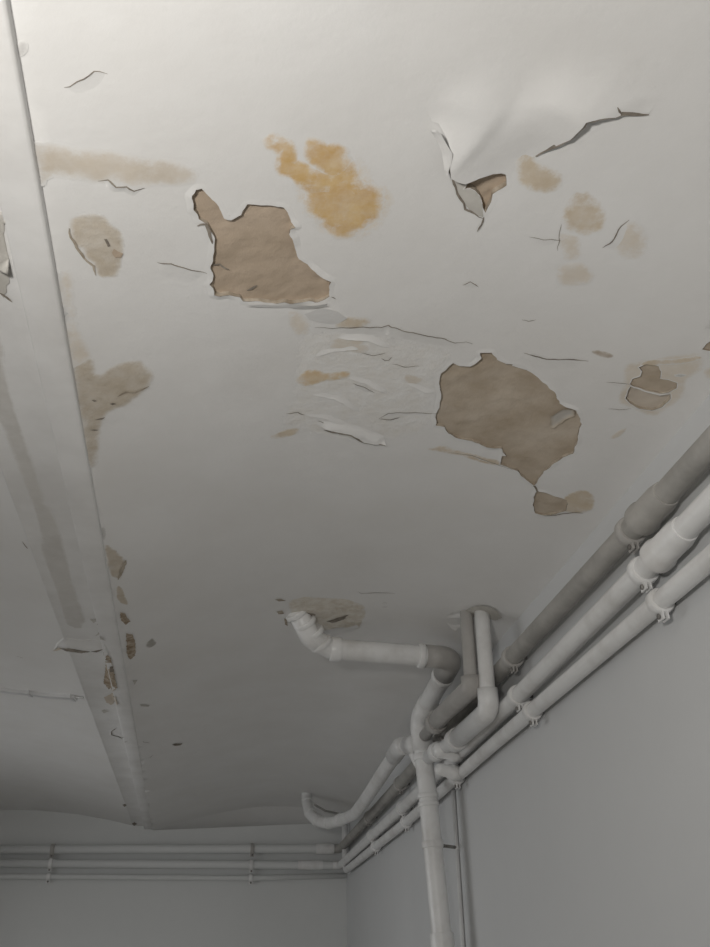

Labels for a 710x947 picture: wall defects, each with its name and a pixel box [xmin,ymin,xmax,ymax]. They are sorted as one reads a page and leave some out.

crack [64,71,107,93]
water stain [262,131,395,242]
flaking render [449,170,512,231]
water stain [515,155,563,194]
peeling [0,212,12,302]
water stain [57,270,155,469]
flaking render [184,184,596,518]
crack [315,325,472,368]
crack [512,353,584,370]
flaking render [618,337,710,417]
flaking render [101,527,136,659]